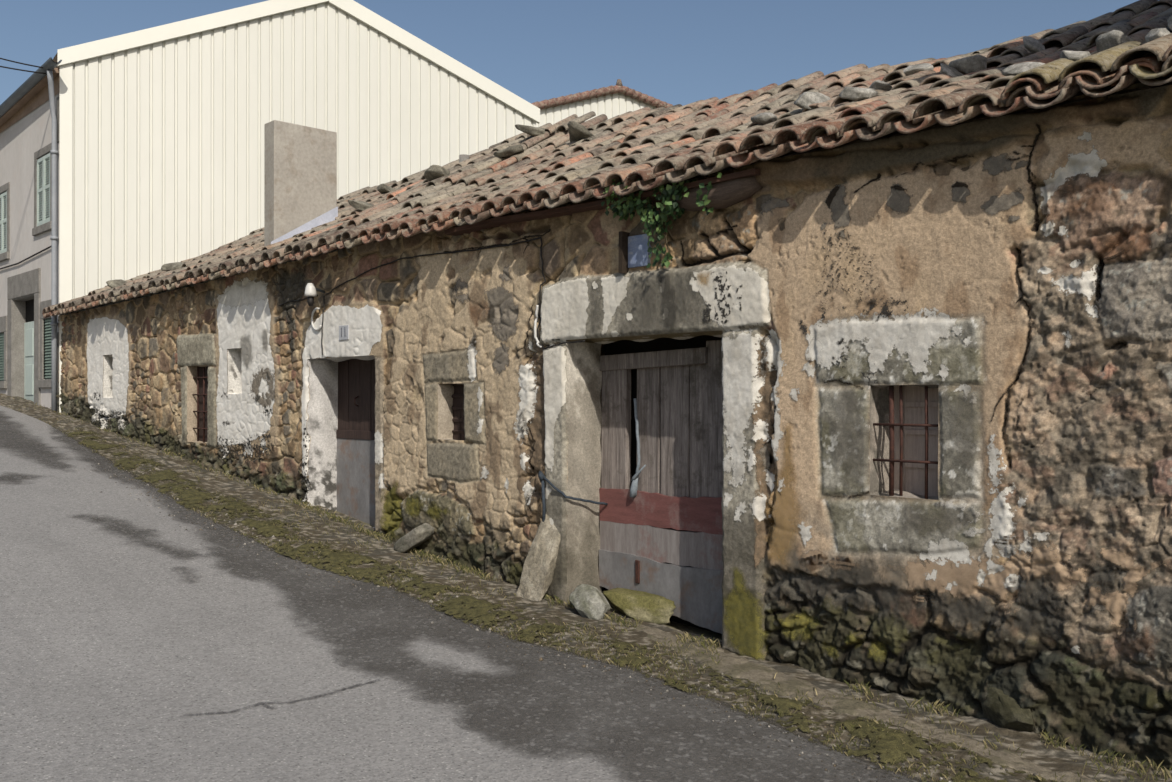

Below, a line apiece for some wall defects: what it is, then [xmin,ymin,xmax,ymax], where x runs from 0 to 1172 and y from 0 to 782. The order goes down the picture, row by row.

crack [854,154,974,193]
peeling [214,277,277,459]
peeling [689,265,800,568]
peeling [803,184,977,404]
crack [991,124,1041,468]
peeling [1036,259,1101,318]
water stain [0,414,929,782]
peeling [791,521,860,572]
water stain [917,574,1073,643]
peeling [888,434,1167,639]